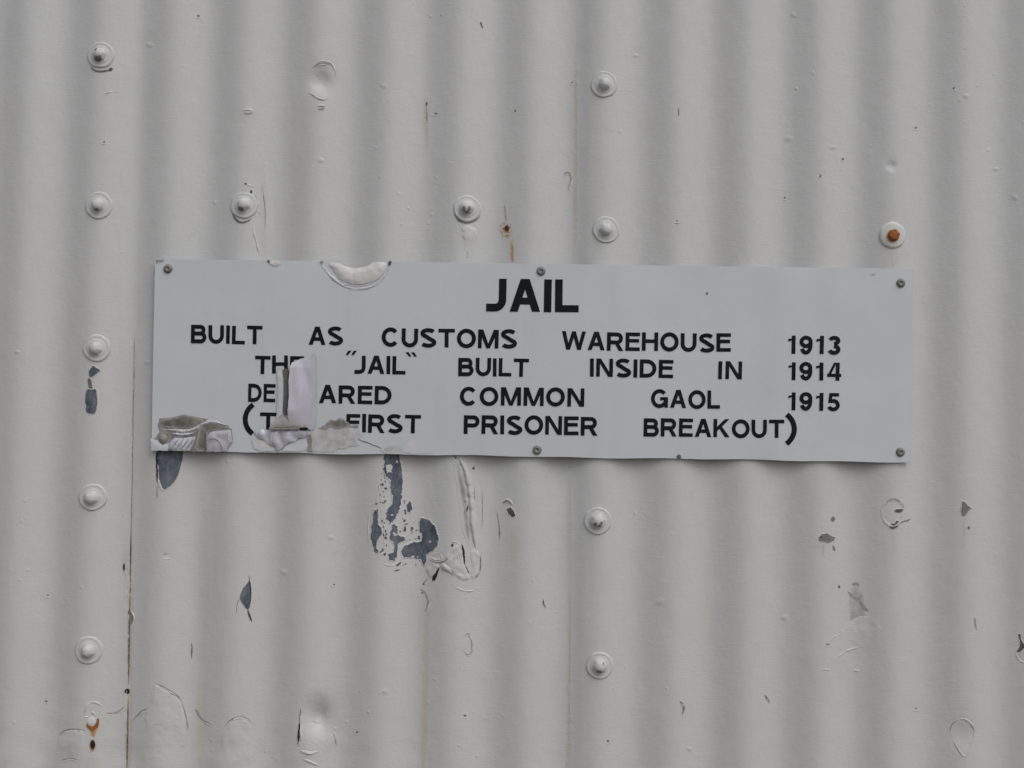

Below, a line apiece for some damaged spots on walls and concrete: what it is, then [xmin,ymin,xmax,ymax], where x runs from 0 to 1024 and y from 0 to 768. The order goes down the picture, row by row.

peeling [85,365,101,415]
peeling [156,451,184,495]
peeling [367,454,483,594]
peeling [236,578,252,621]